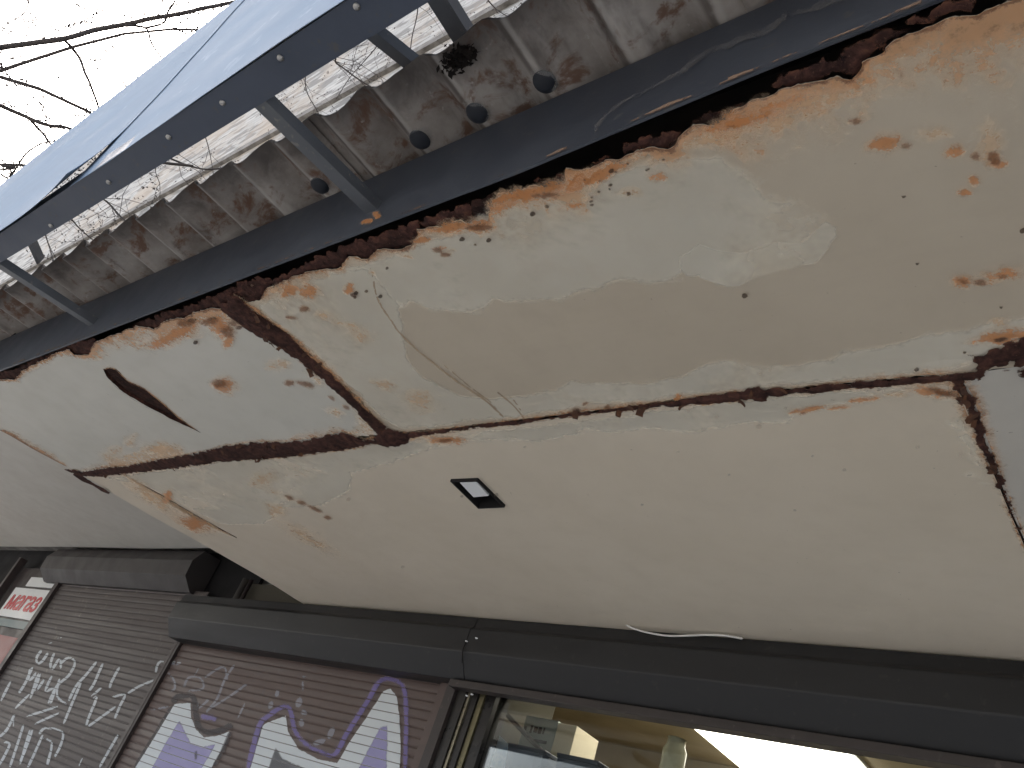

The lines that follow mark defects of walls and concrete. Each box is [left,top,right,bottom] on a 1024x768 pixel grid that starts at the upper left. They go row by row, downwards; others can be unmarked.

rust [0,0,1024,414]
peeling [261,159,1024,442]
crack [103,367,199,432]
rust [0,430,110,494]
crack [123,473,237,538]
peeling [104,440,427,524]